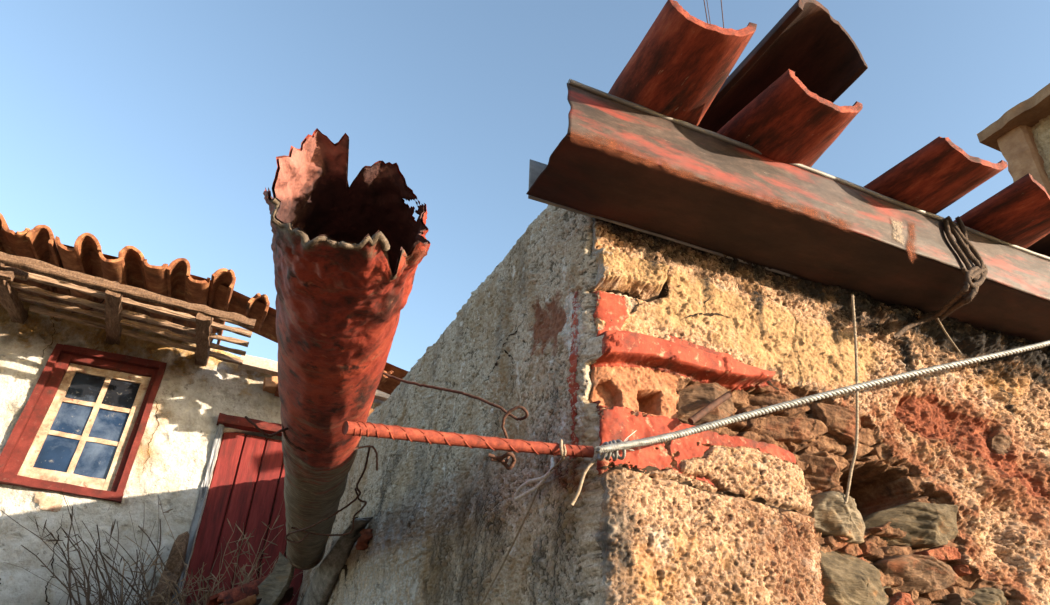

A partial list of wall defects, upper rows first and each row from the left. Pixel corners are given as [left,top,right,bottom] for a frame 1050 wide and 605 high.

rust [571,131,695,178]
rust [771,199,847,229]
rust [907,224,915,259]
spalling [263,376,279,397]
spalling [342,291,1022,605]
spalling [893,393,1050,499]
crack [598,464,814,530]
peeling [299,517,373,605]